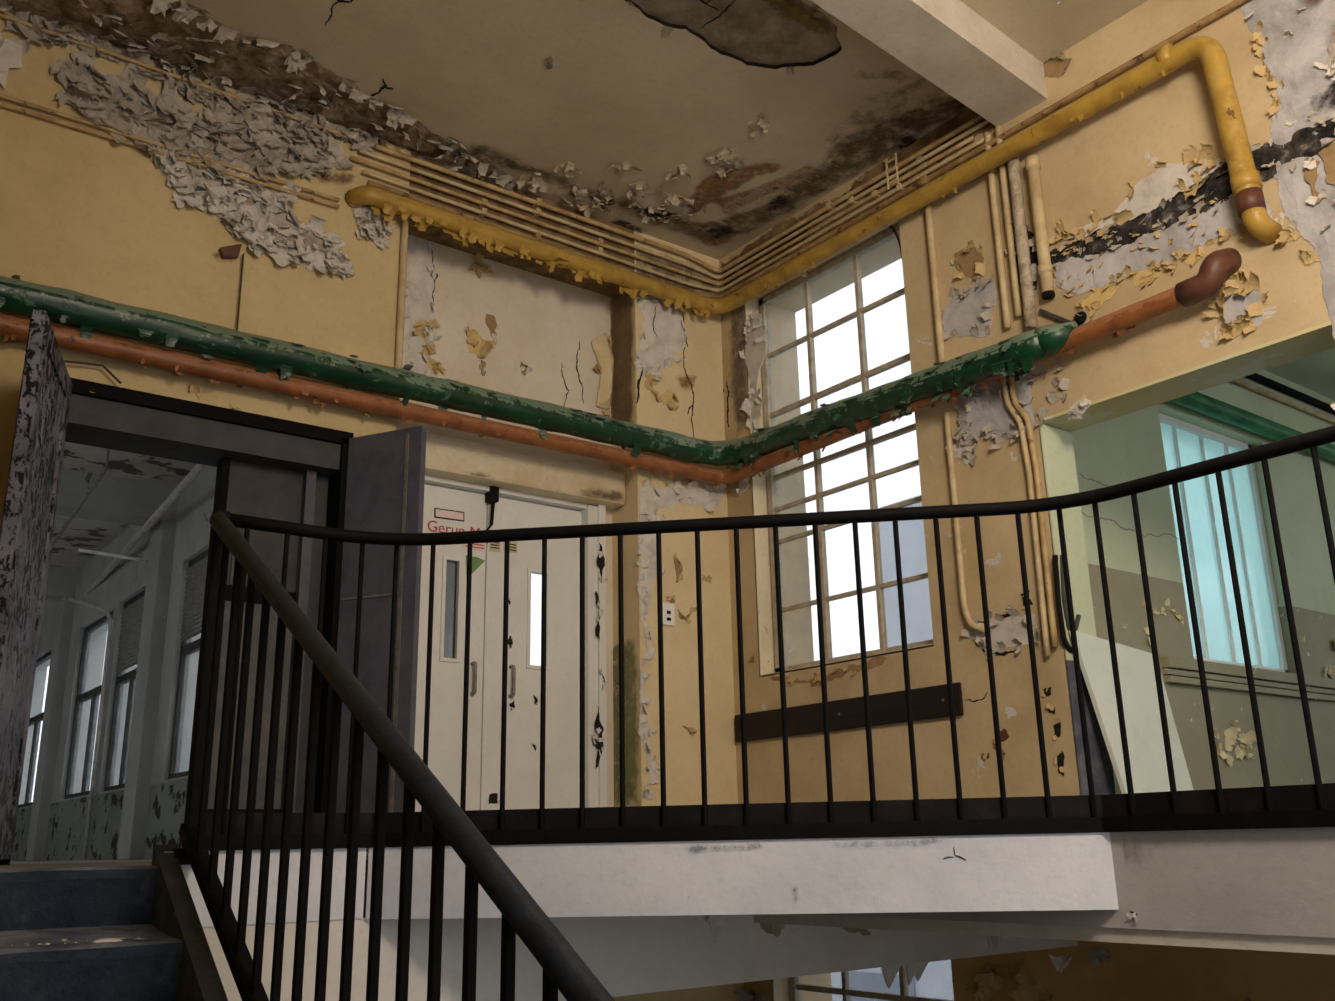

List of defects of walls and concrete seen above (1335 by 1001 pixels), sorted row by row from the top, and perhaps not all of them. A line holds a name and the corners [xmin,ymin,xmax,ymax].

crack [325,0,353,26]
mould [1320,84,1335,107]
spalling [0,0,711,409]
damp [470,146,550,179]
peeling [704,148,748,179]
damp [588,100,965,293]
spalling [1005,142,1250,317]
spalling [1241,0,1335,339]
peeling [1203,268,1269,340]
spalling [621,240,1092,800]
peeling [1213,719,1257,767]